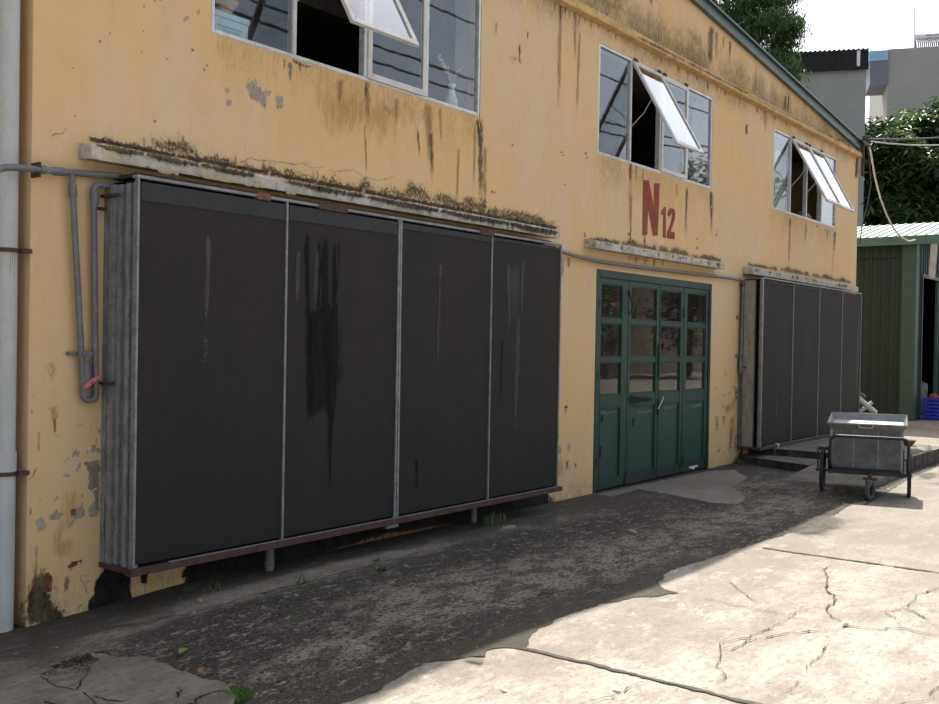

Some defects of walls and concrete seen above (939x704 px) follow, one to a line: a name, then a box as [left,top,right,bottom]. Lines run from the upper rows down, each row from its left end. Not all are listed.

spalling [246,79,284,110]
damp [639,28,747,95]
damp [89,119,559,236]
peeling [35,428,101,531]
damp [19,568,65,629]
crack [711,564,939,692]
crack [40,673,132,704]
crack [176,687,228,704]